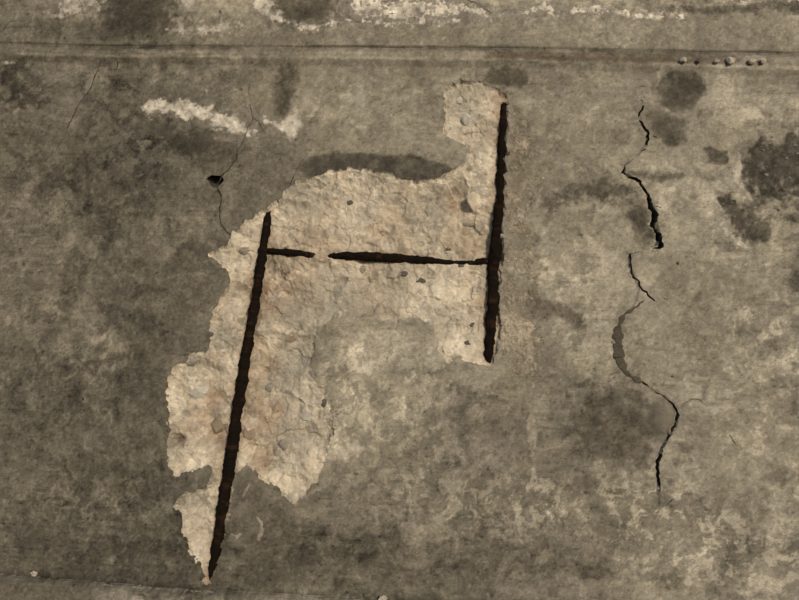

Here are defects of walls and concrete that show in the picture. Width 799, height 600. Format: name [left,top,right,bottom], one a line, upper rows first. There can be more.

damp [252,0,694,31]
crack [56,59,118,150]
damp [142,98,257,137]
crack [207,85,265,235]
damp [263,70,302,139]
damp [647,72,703,145]
damp [741,133,799,211]
rust [327,102,507,363]
damp [717,194,770,242]
spalling [165,79,548,585]
crack [611,84,704,513]
rust [208,211,315,579]